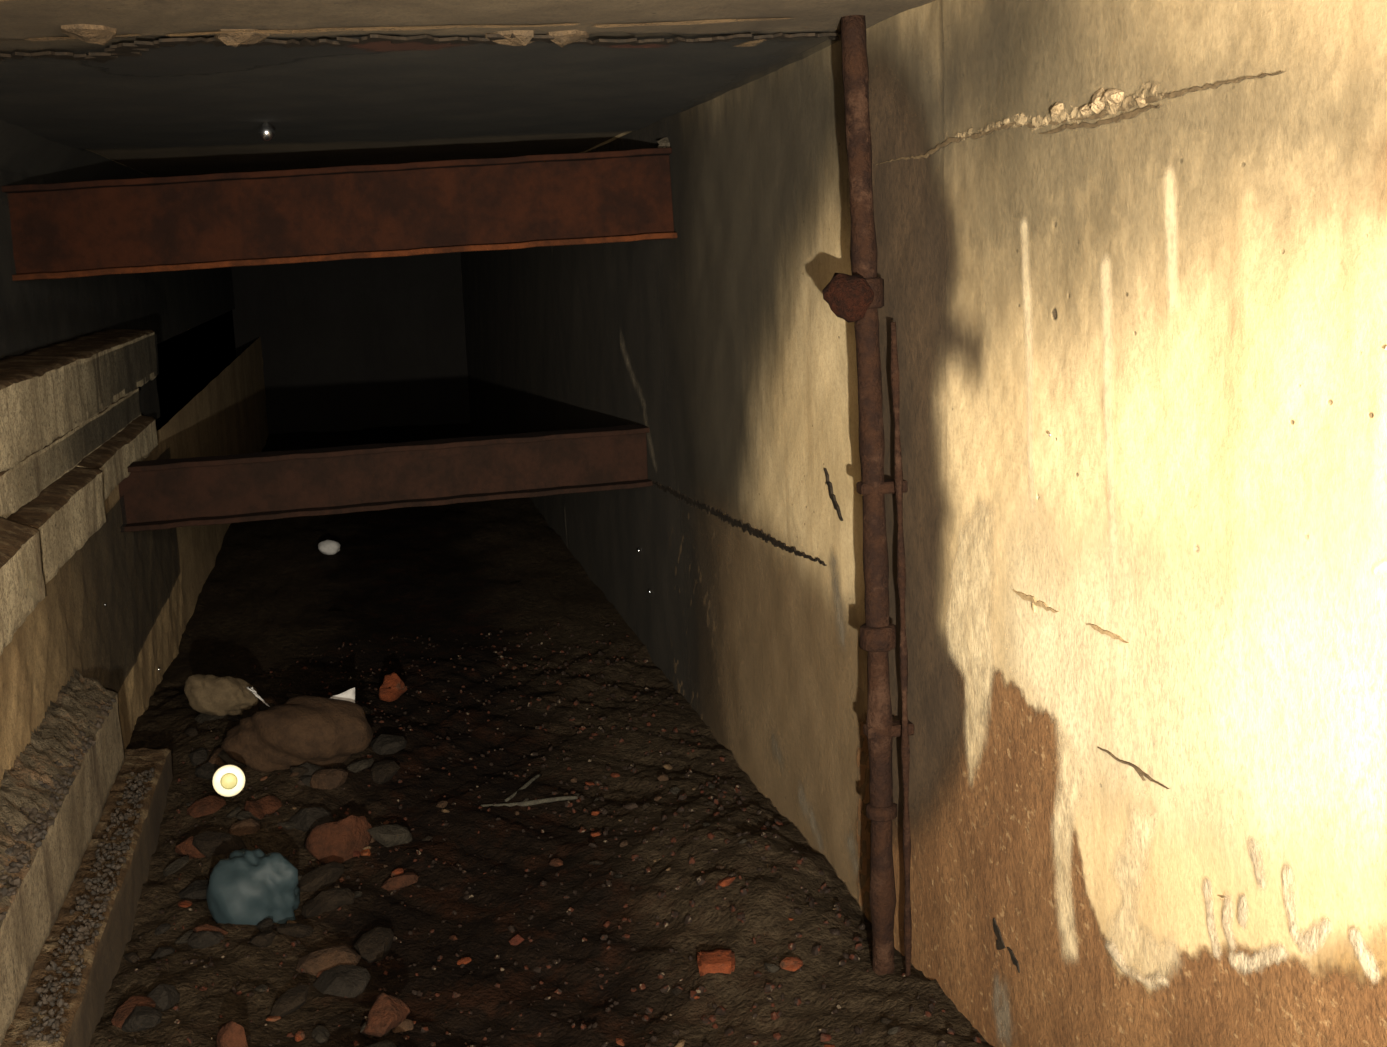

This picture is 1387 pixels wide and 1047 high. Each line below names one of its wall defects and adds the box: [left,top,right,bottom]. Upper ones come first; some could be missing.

crack [876,71,1284,165]
water stain [673,504,872,923]
water stain [868,60,1387,1047]